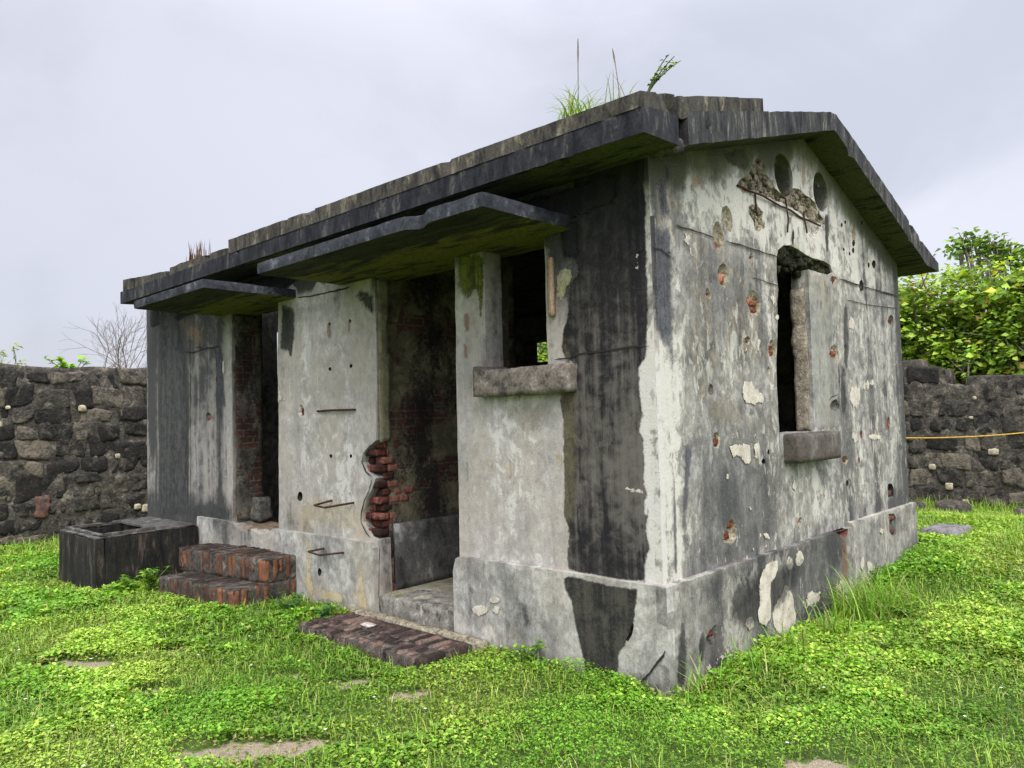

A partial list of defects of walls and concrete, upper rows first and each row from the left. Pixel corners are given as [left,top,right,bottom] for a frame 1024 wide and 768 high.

spalling [736,158,825,239]
water stain [245,276,296,289]
water stain [458,255,484,317]
water stain [150,311,229,519]
water stain [522,159,674,679]
flaking render [713,432,769,464]
flaking render [742,381,764,405]
flaking render [745,551,821,633]
crack [636,651,665,690]